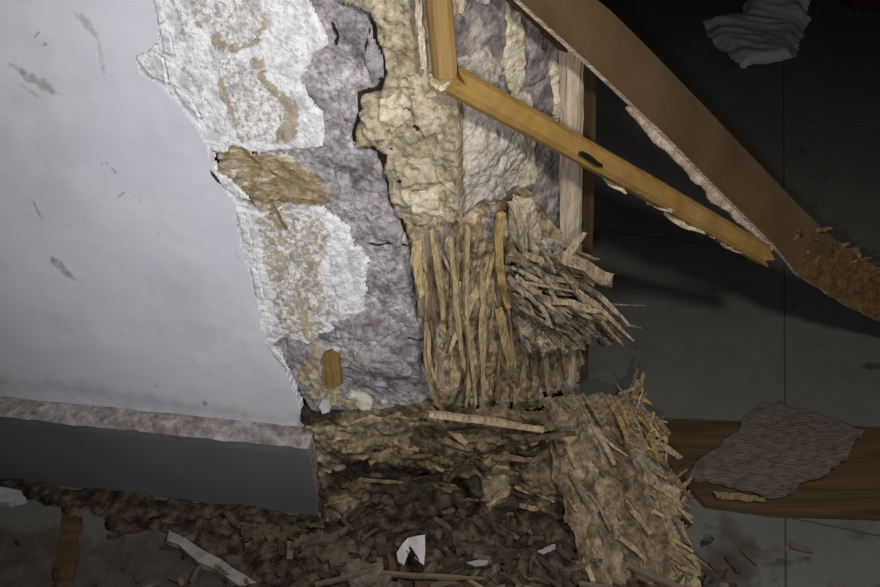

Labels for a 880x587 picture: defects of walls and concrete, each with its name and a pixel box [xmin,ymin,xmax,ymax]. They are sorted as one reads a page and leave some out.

flaking render [453,0,561,122]
flaking render [136,0,497,413]
flaking render [506,136,560,229]